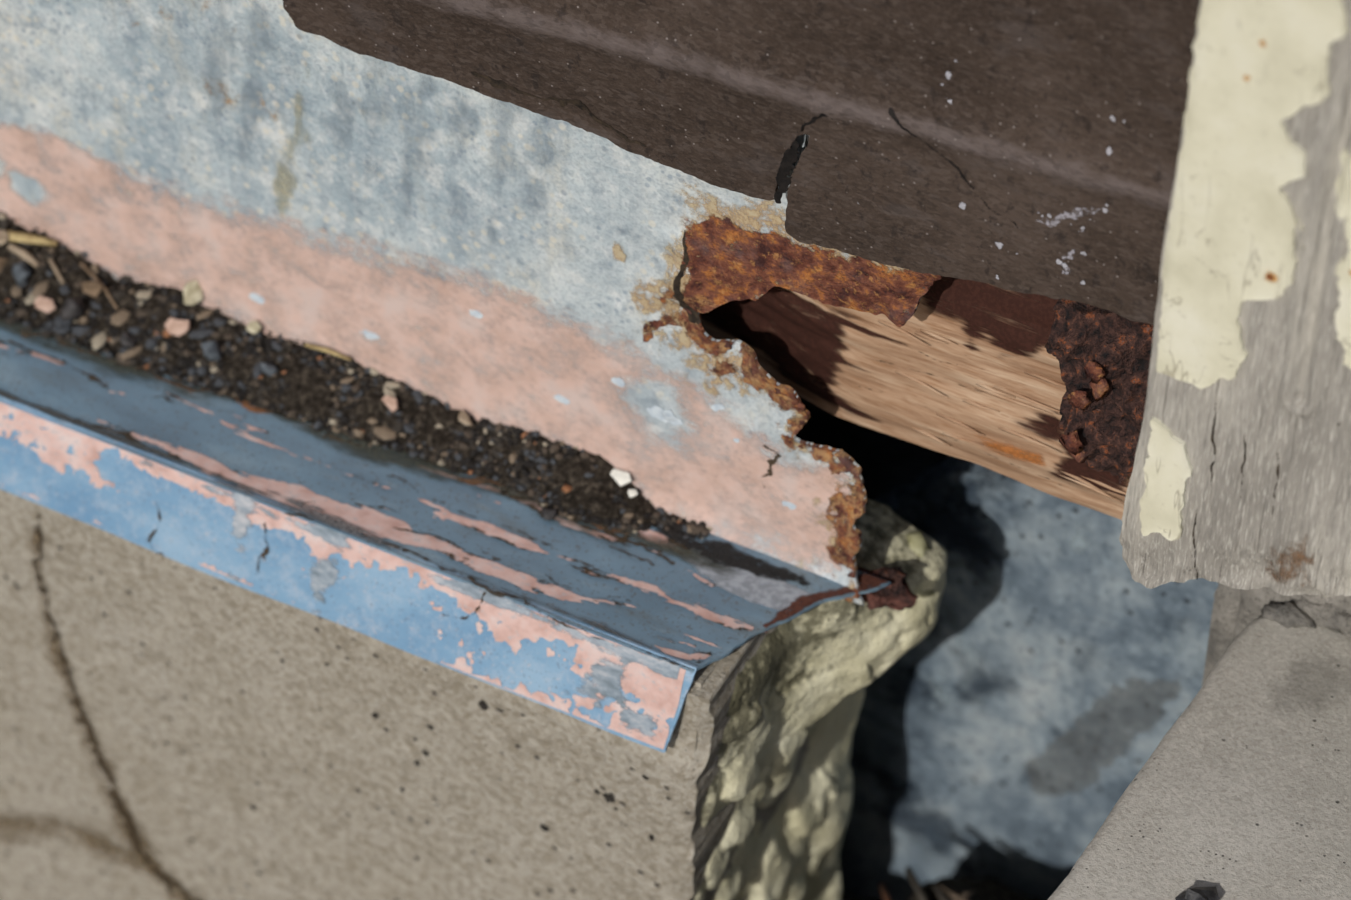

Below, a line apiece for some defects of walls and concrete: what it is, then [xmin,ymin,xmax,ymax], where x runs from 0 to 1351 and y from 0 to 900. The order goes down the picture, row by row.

crack [32,514,194,900]
peeling [0,402,754,749]
peeling [0,124,865,578]
corrosion [612,244,626,262]
corrosion [631,186,943,633]
crack [774,114,828,204]
corrosion [1060,430,1083,455]
corrosion [1067,361,1110,411]
peeling [1139,417,1193,541]
peeling [1156,0,1351,389]